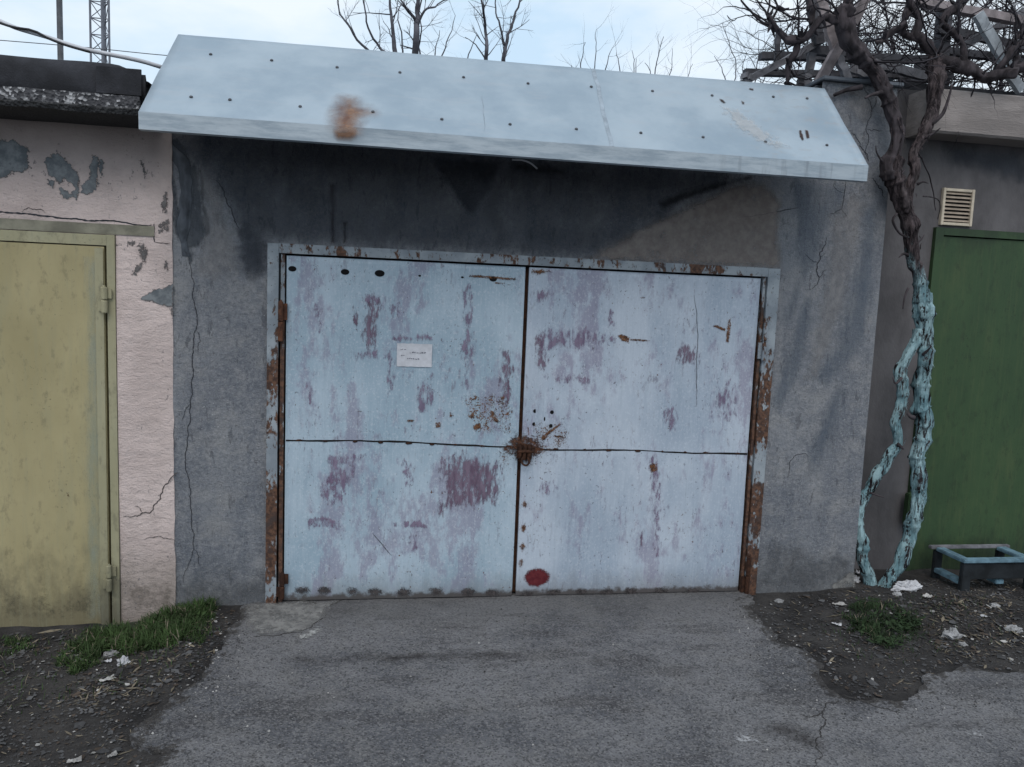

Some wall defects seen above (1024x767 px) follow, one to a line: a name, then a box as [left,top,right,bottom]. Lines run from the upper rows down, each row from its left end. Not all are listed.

corrosion [336,100,363,138]
peeling [0,138,32,179]
peeling [44,152,104,201]
peeling [158,192,169,234]
leakage [172,135,726,269]
peeling [127,241,148,276]
peeling [141,284,173,315]
crack [0,207,201,576]
corrosion [463,392,569,471]
peeling [438,450,503,517]